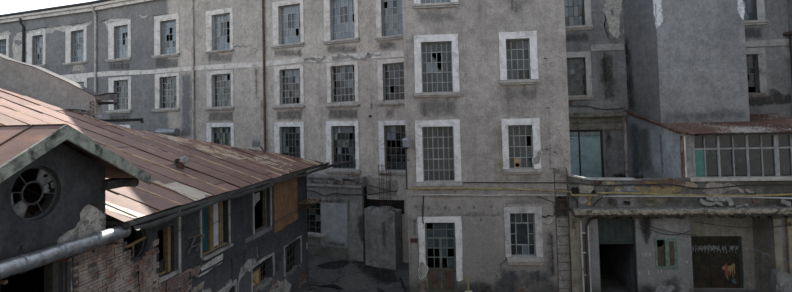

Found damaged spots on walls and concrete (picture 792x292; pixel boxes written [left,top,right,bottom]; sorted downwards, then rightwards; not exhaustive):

peeling [652,0,664,29]
peeling [736,0,746,20]
flaking render [633,177,760,207]
flaking render [53,203,107,245]
flaking render [553,180,630,292]
flaking render [71,235,257,292]
flaking render [270,252,291,292]
flaking render [416,261,429,292]